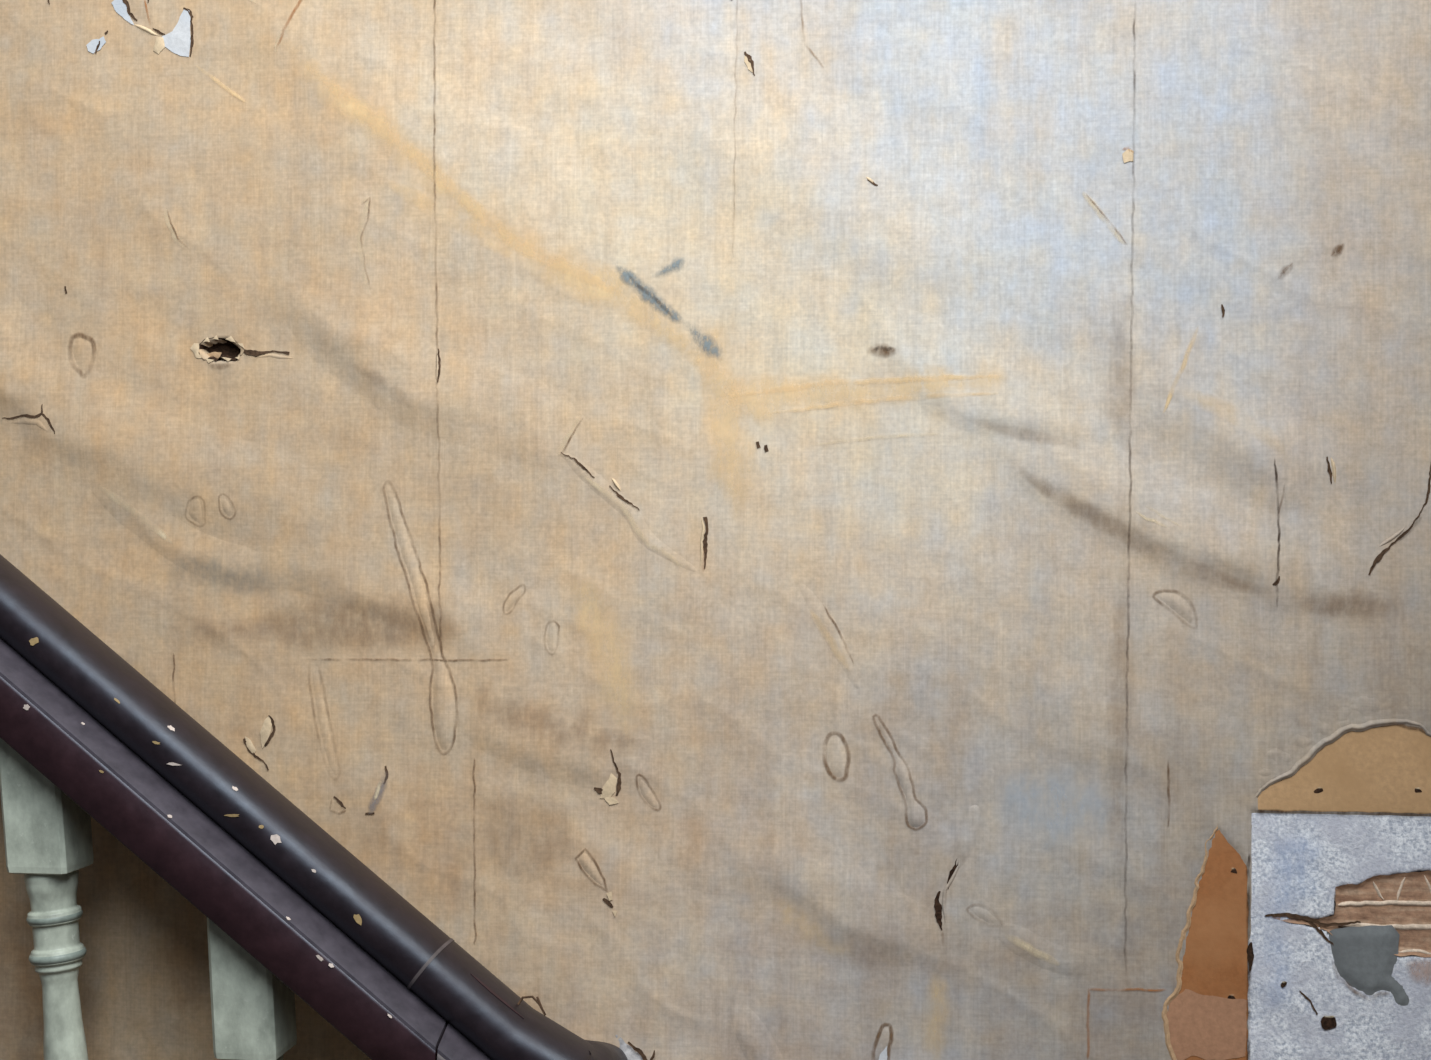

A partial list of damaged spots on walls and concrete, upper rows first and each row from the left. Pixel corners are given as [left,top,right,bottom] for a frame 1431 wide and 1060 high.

flaking render [86,30,108,53]
flaking render [153,7,194,57]
peeling [190,335,245,363]
crack [700,517,708,569]
crack [1368,464,1431,575]
peeling [600,773,619,805]
peeling [1162,695,1431,1060]